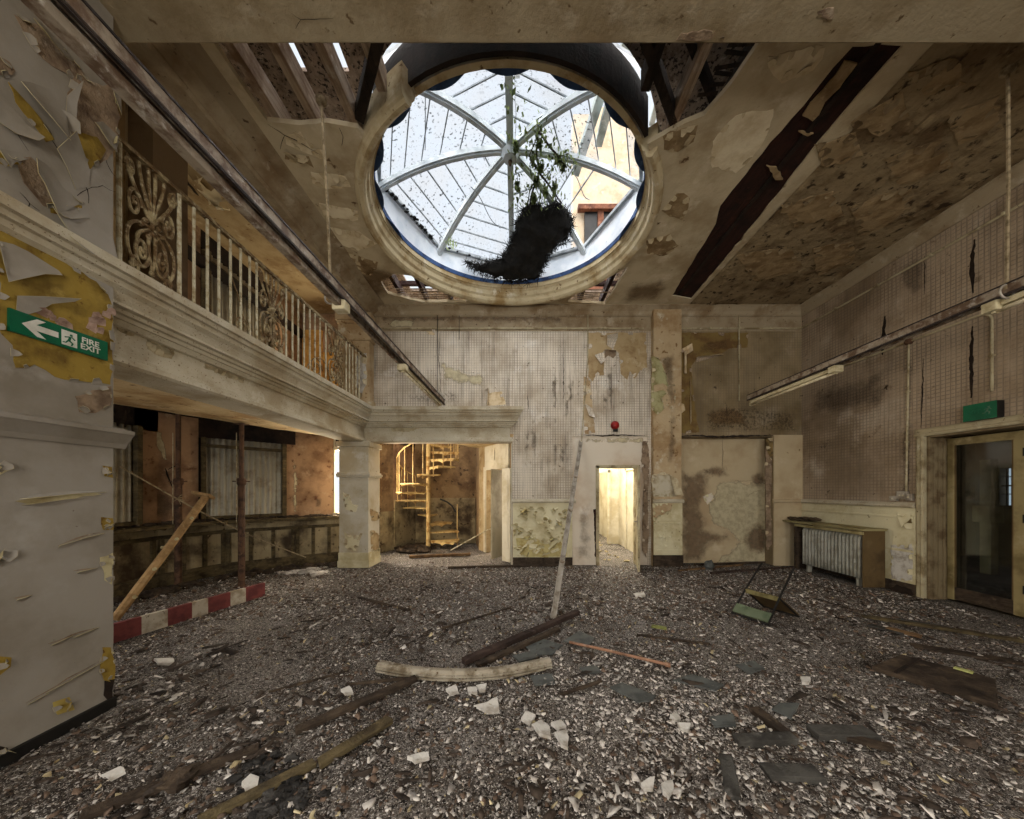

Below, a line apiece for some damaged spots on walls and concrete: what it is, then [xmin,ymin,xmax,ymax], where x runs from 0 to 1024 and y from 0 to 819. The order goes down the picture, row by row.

peeling [0,13,122,169]
peeling [663,125,698,152]
peeling [710,109,774,173]
peeling [18,157,117,265]
peeling [662,193,690,220]
peeling [646,234,678,256]
peeling [0,231,134,414]
peeling [511,506,568,557]
leakage [683,468,723,559]
leakage [747,526,765,551]
peeling [100,553,115,584]
peeling [99,647,116,700]